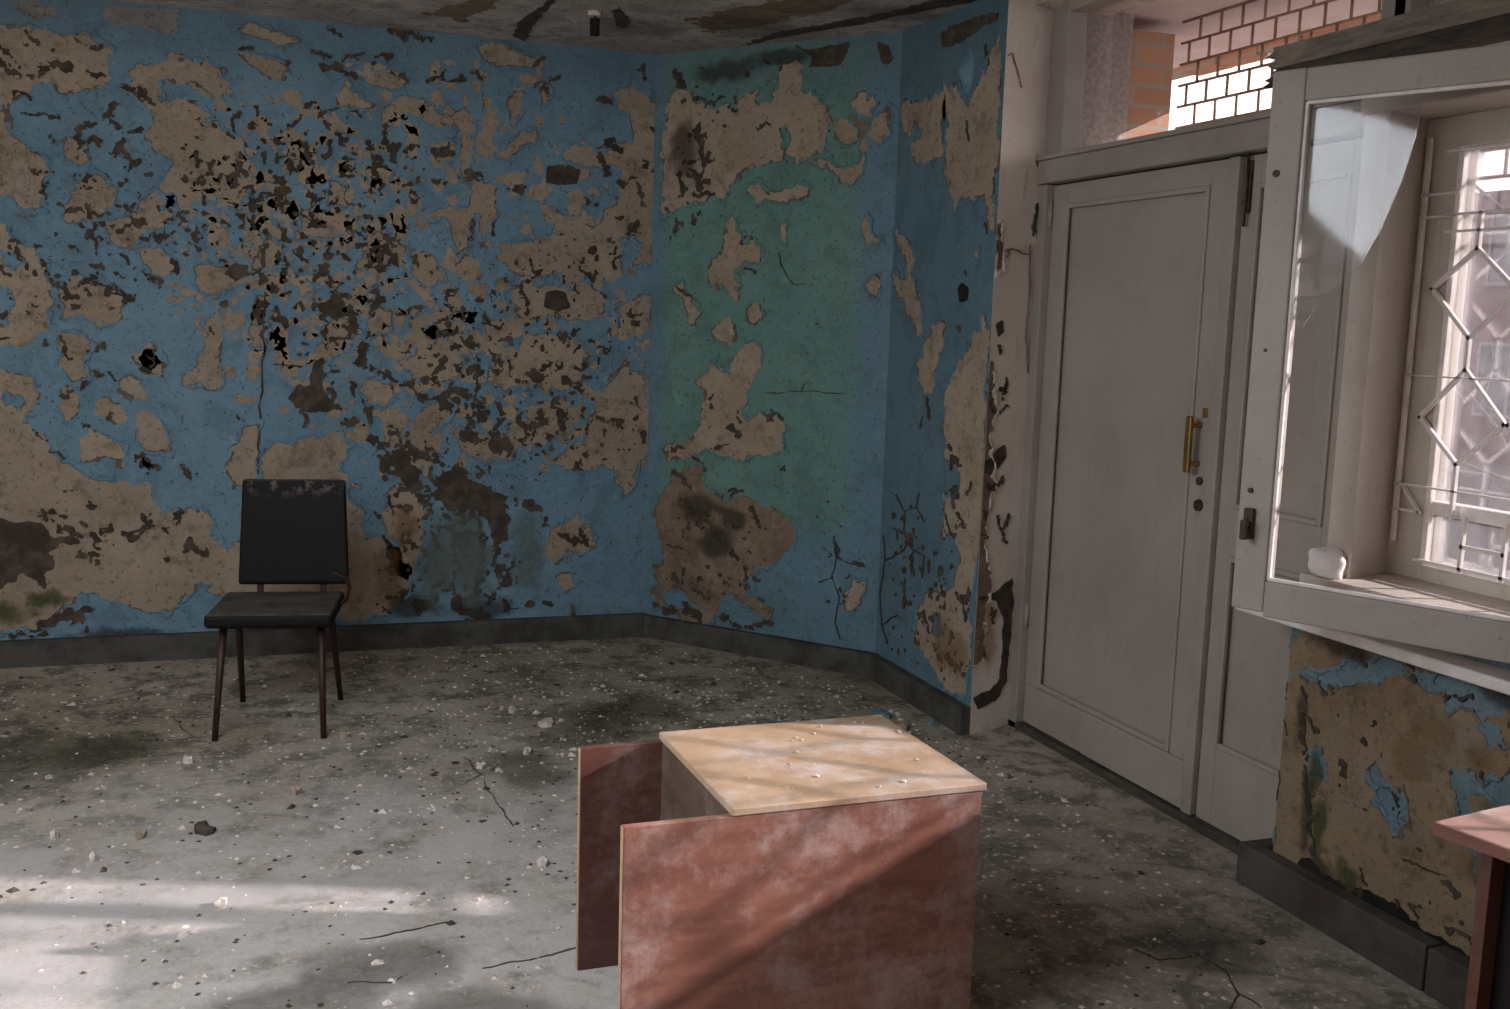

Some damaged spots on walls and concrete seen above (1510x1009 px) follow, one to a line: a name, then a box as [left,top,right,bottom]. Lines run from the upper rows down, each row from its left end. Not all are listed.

peeling [0,0,1006,639]
peeling [858,211,1014,709]
peeling [1272,630,1510,959]